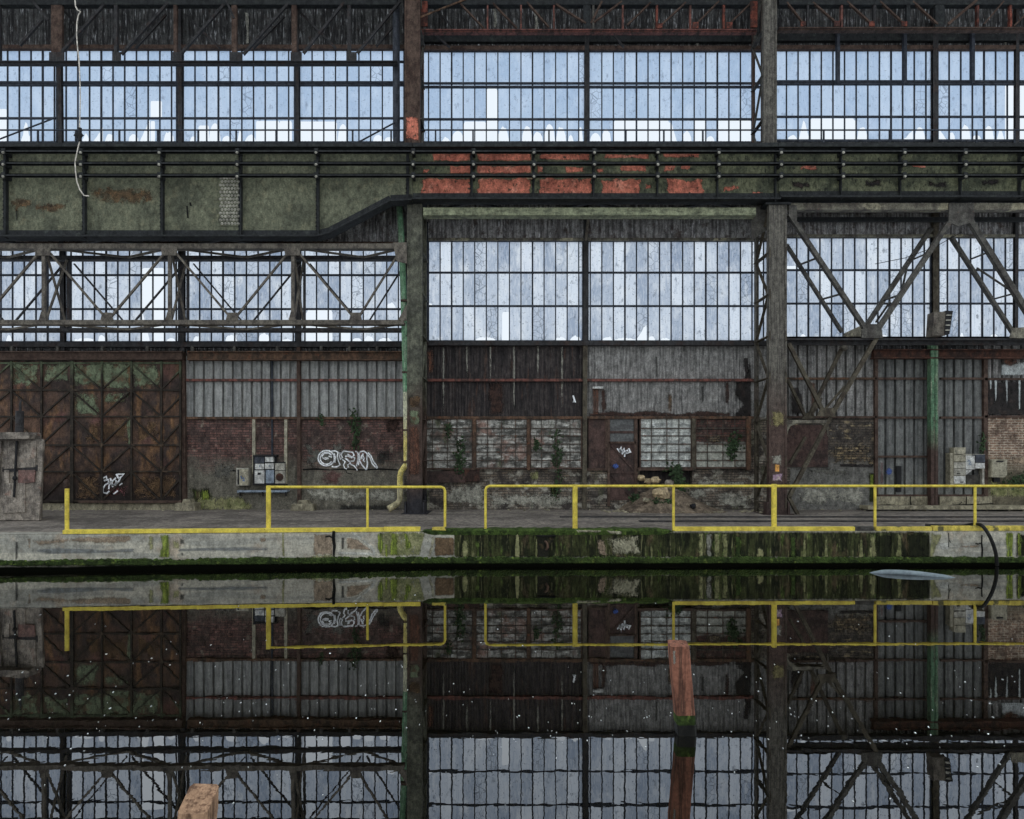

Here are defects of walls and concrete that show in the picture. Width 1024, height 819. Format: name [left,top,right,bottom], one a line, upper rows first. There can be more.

peeling [421,154,652,193]
peeling [663,154,704,193]
damp [0,532,1024,572]